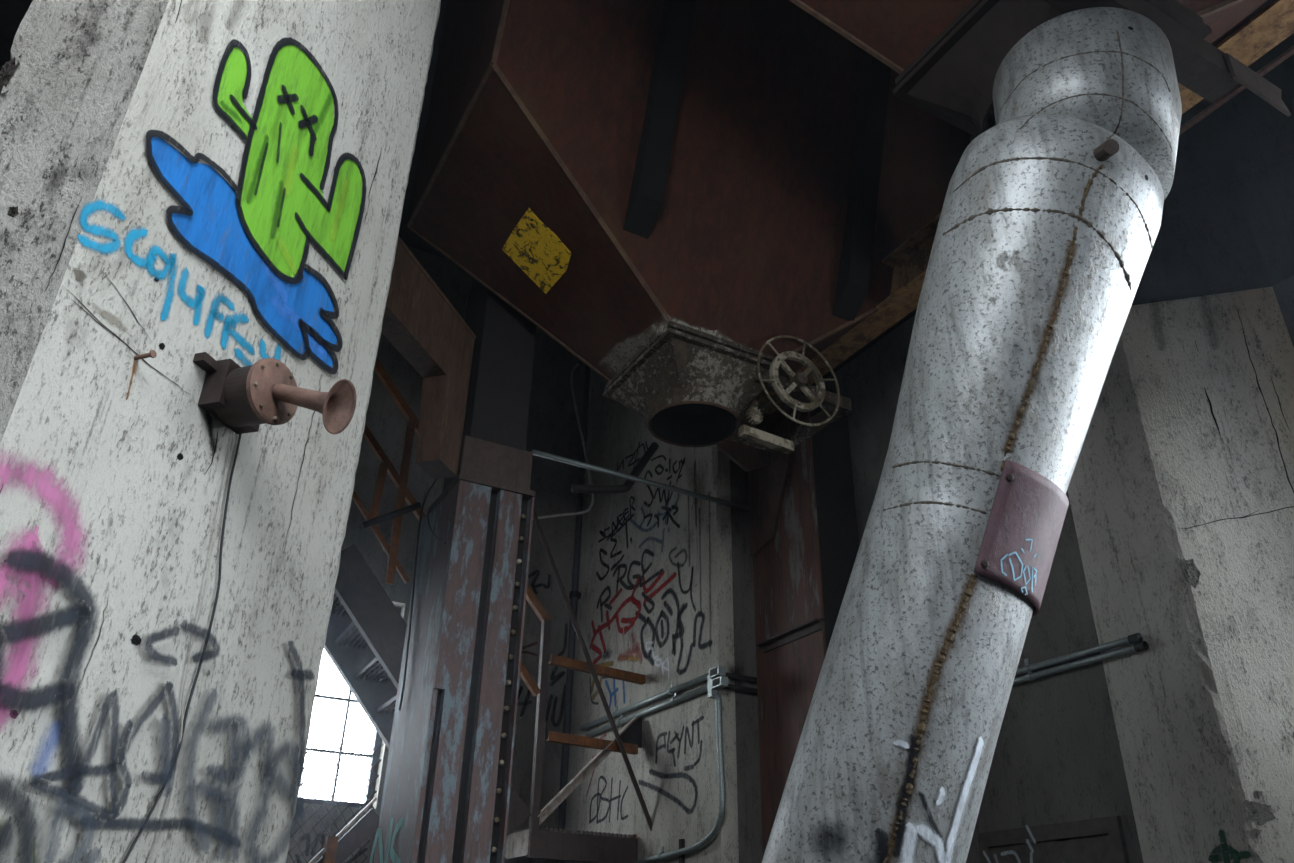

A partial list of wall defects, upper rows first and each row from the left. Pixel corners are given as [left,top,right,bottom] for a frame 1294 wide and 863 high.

rust [1001,240,1077,452]
crack [1182,309,1294,529]
spalling [1180,558,1201,589]
rust [915,574,978,754]
spalling [1241,790,1276,837]